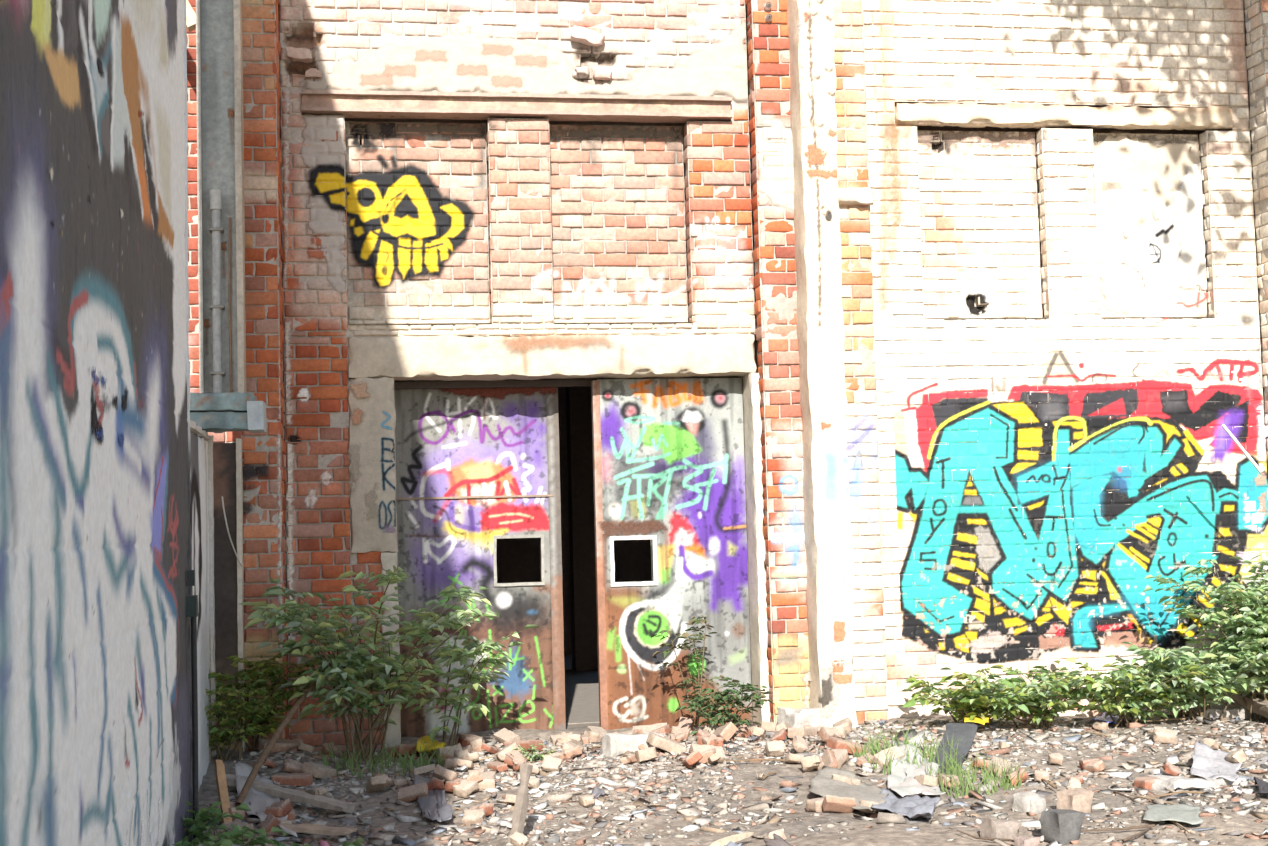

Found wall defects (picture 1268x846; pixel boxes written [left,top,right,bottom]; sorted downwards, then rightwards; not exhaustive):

spalling [286,26,322,80]
flaking render [361,44,546,87]
spalling [570,25,614,81]
flaking render [805,144,837,178]
flaking render [1023,161,1216,318]